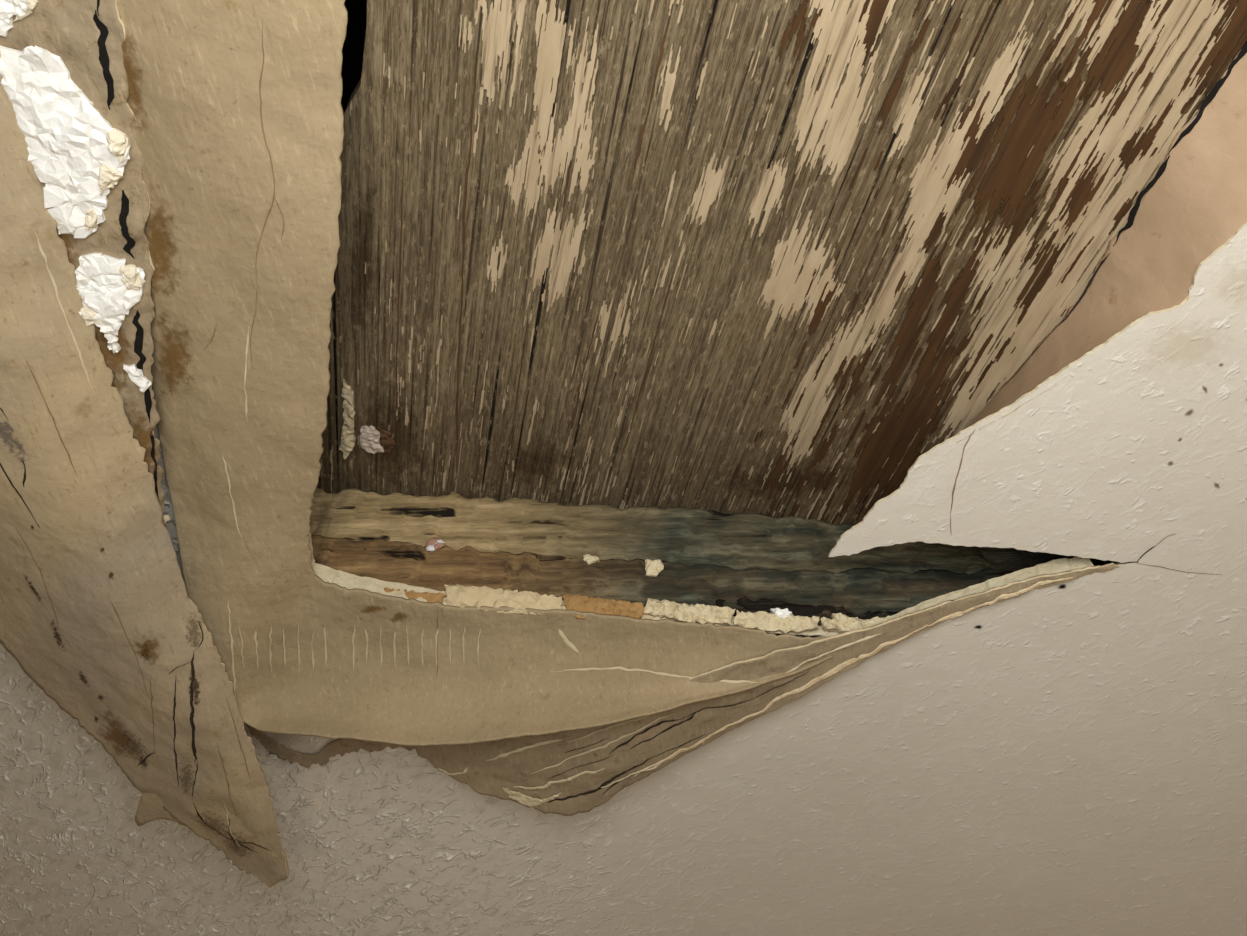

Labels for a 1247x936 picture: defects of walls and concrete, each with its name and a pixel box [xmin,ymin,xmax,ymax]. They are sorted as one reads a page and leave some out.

crack [93,0,114,110]
water stain [121,41,141,110]
crack [119,190,135,258]
water stain [147,212,174,292]
peeling [446,0,1247,524]
peeling [0,0,289,888]
crack [132,310,160,502]
water stain [158,318,190,388]
peeling [321,277,488,498]
spalling [645,559,664,577]
crack [1116,534,1221,575]
peeling [247,562,1120,816]